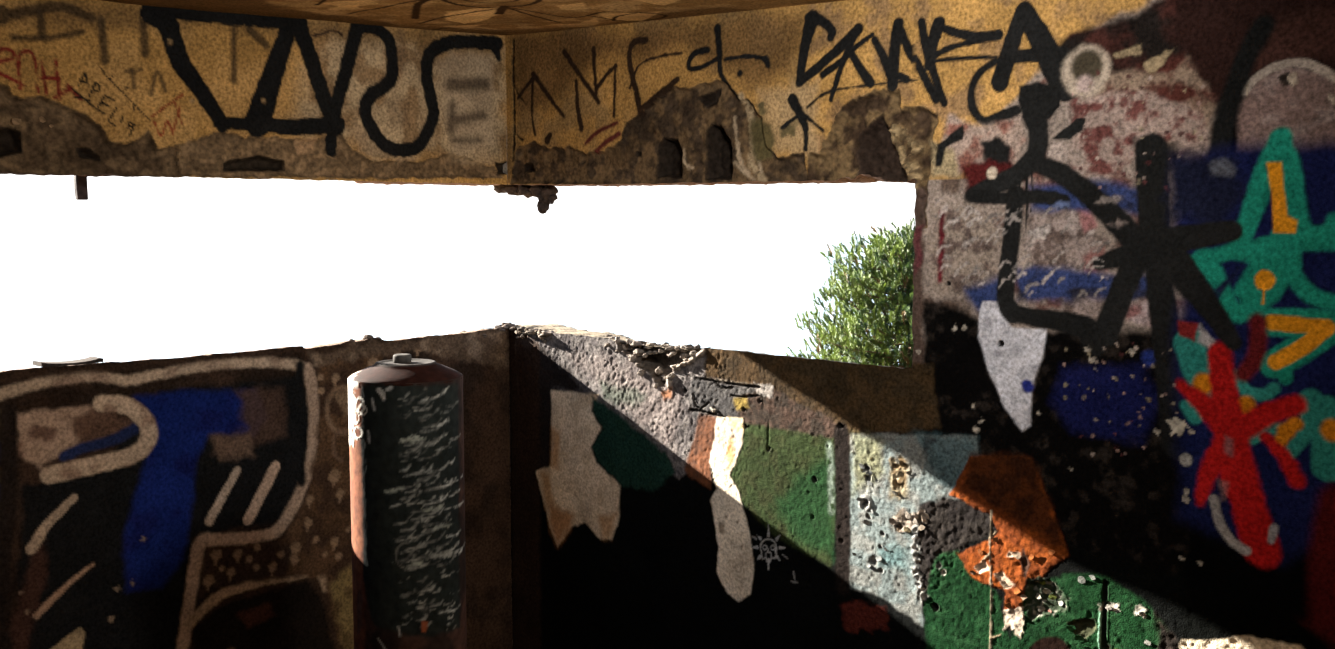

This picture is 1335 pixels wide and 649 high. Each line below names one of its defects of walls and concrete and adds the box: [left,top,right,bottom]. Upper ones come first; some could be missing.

spalling [460,322,554,344]
spalling [604,334,706,400]
peeling [852,454,947,604]
peeling [949,450,1147,649]